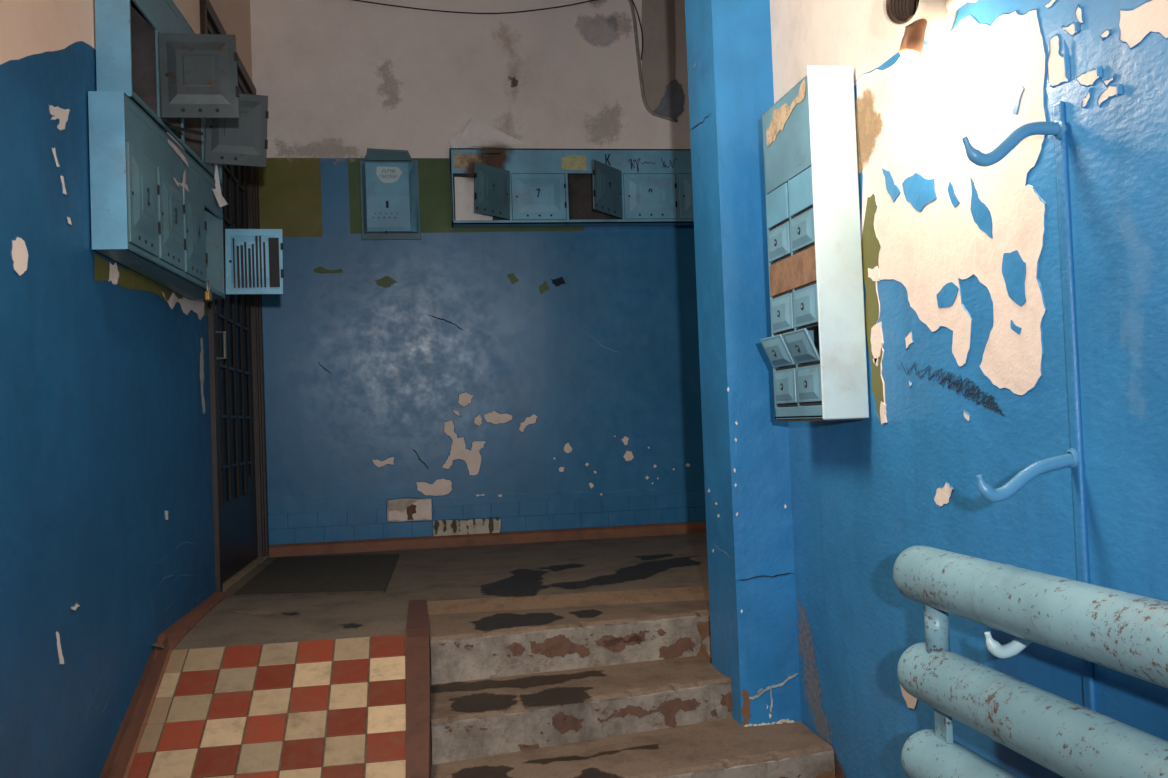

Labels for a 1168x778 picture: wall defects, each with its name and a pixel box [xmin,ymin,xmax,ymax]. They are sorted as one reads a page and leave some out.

peeling [1100,0,1168,49]
peeling [48,104,70,131]
peeling [856,0,1123,425]
peeling [10,236,29,277]
peeling [386,391,538,536]
peeling [621,436,634,462]
damp [480,554,701,597]
crack [712,543,795,581]
damp [471,609,603,631]
peeling [493,621,712,664]
crack [749,673,798,714]
damp [452,744,659,778]